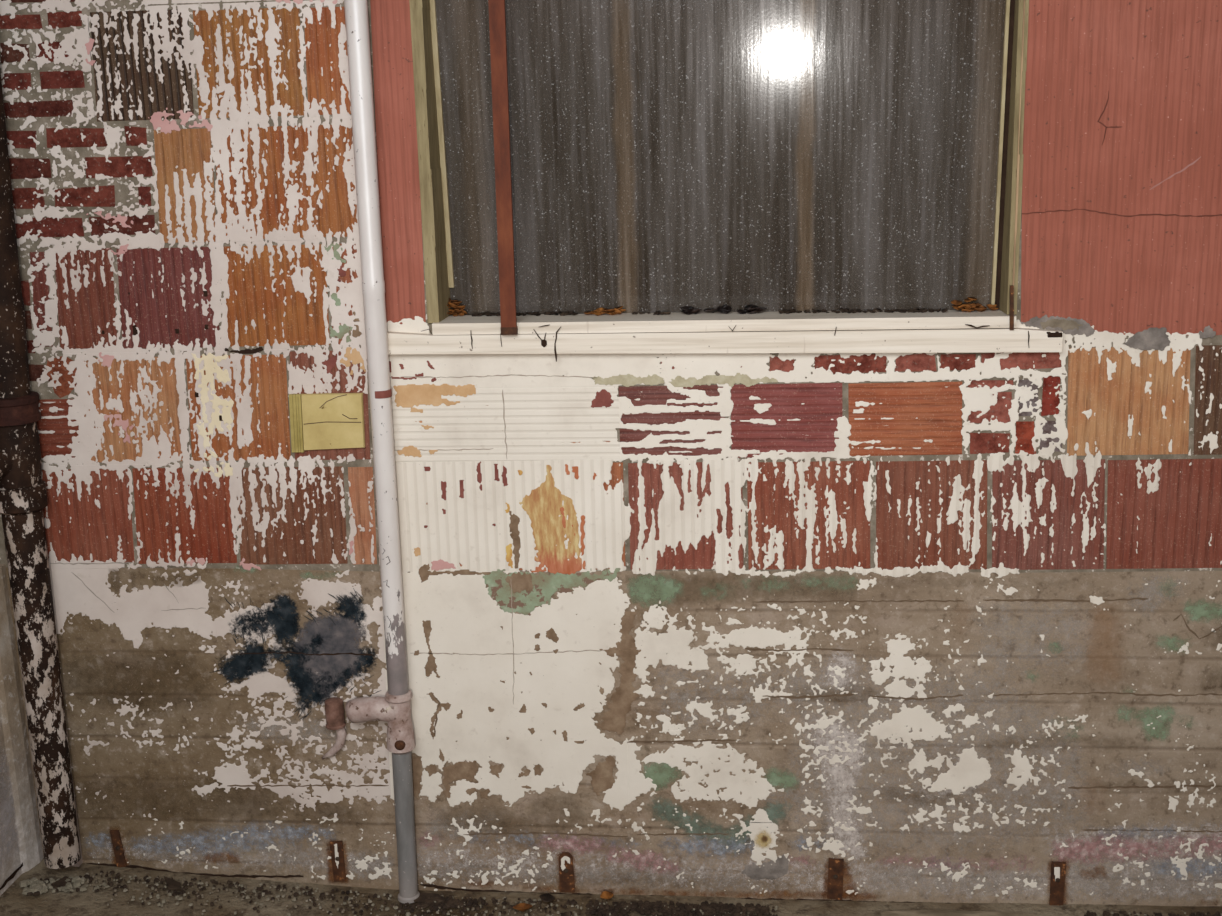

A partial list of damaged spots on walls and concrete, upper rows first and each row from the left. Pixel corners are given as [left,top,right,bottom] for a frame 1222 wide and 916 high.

crack [1097,92,1121,145]
crack [1022,209,1222,217]
peeling [387,316,430,334]
peeling [0,0,395,880]
water stain [303,588,364,624]
peeling [389,325,1222,897]